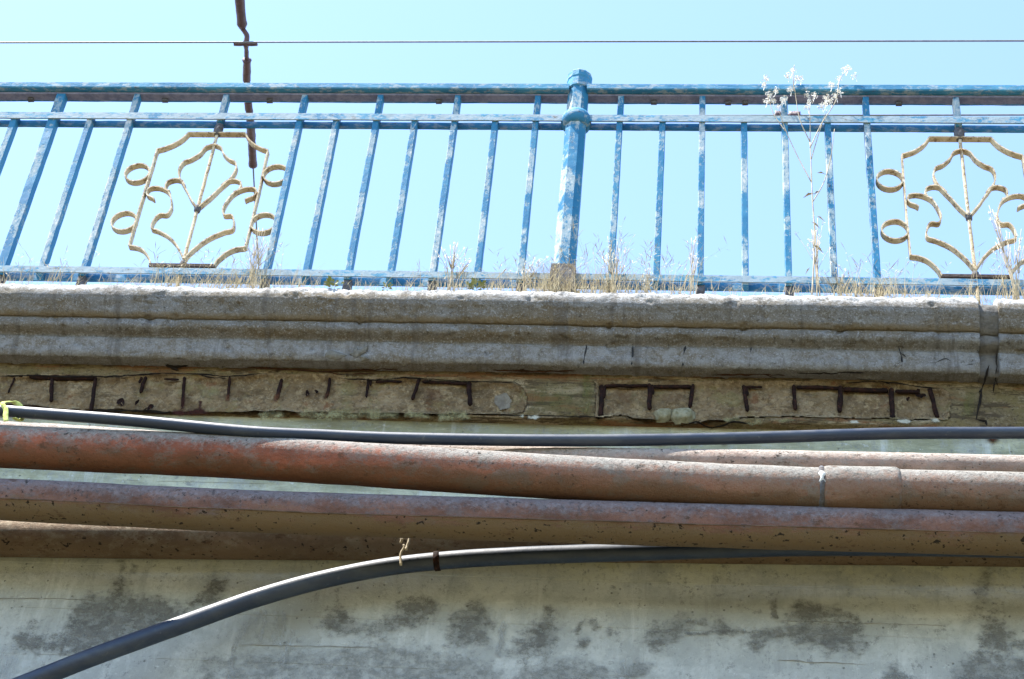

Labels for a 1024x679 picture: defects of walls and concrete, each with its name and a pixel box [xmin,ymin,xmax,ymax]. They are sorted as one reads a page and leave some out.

corrosion [172,395,207,416]
spalling [0,372,527,414]
spalling [594,379,952,425]
crack [718,348,998,425]
damp [13,575,225,655]
damp [325,597,436,634]
damp [448,604,606,679]
damp [647,600,863,655]
damp [956,612,1024,679]